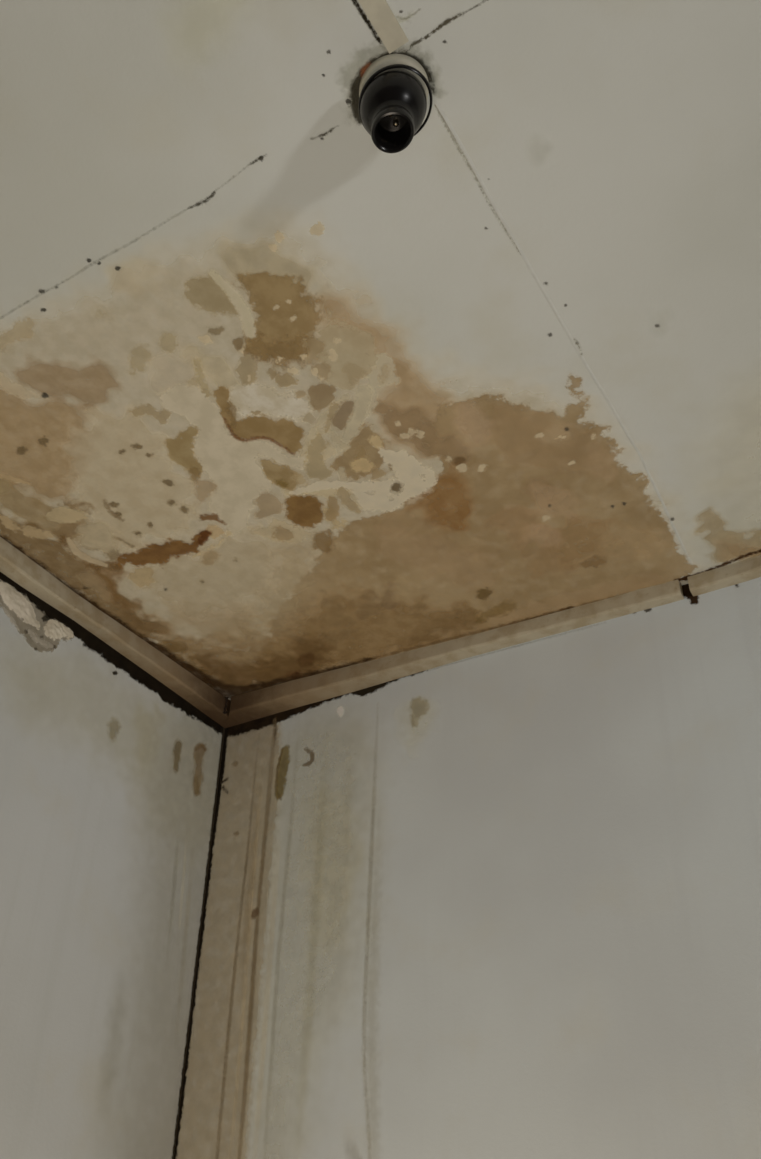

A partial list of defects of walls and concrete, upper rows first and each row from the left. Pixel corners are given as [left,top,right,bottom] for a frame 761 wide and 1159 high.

crack [410,0,484,47]
peeling [0,271,438,612]
leakage [0,251,697,698]
peeling [447,456,486,472]
leakage [699,511,761,562]
crack [675,549,761,604]
flaking render [0,581,74,652]
leakage [175,724,279,1159]